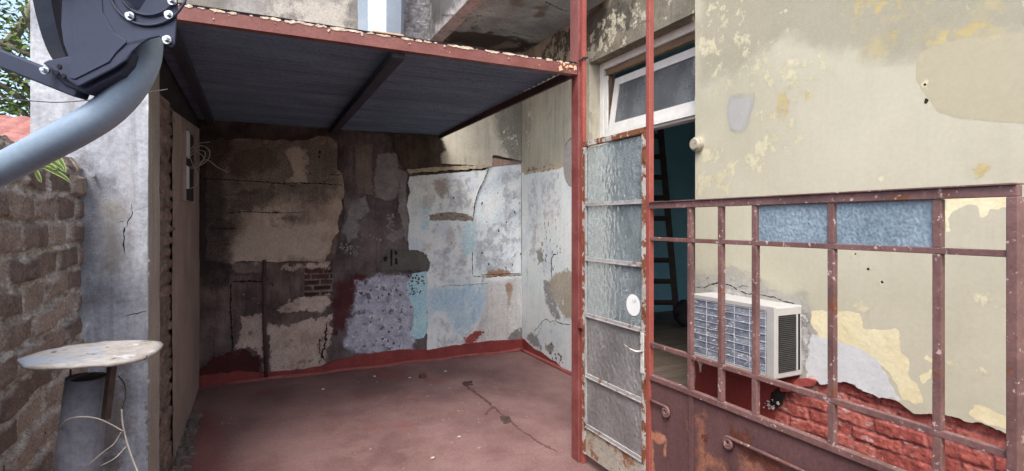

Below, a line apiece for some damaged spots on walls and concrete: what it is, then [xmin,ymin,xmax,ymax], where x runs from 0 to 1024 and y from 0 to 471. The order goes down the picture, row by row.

spalling [178,0,646,139]
peeling [698,0,809,118]
peeling [697,132,772,196]
crack [105,199,141,257]
spalling [304,132,520,362]
peeling [945,197,1006,232]
crack [698,277,794,304]
crack [319,321,328,364]
spalling [776,301,1006,471]